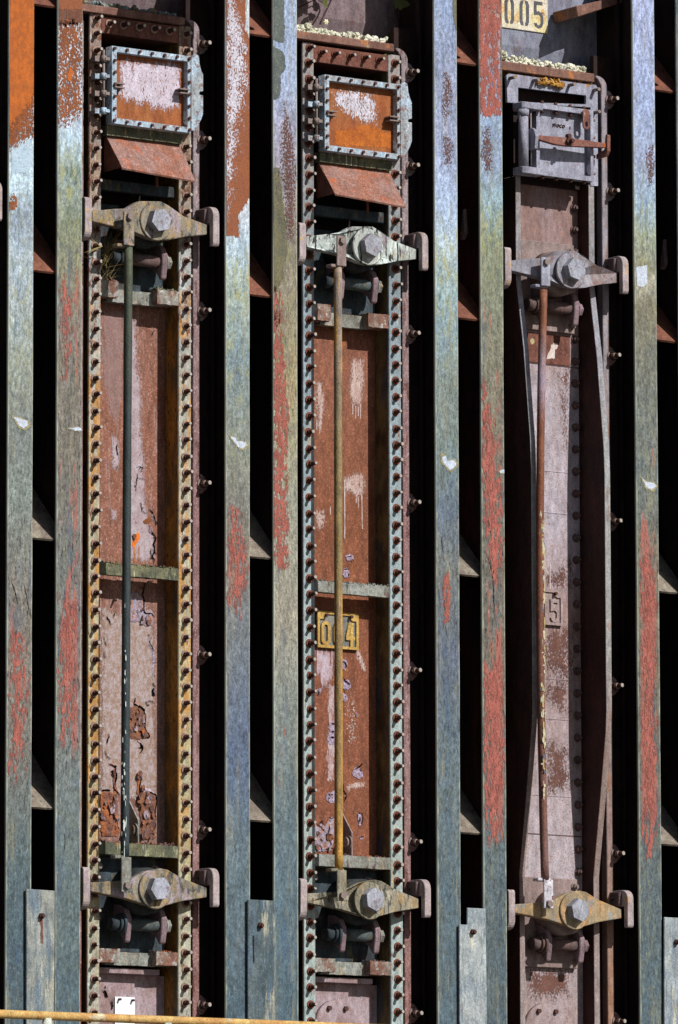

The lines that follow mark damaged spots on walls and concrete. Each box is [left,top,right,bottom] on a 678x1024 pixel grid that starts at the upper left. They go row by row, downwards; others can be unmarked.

corrosion [10,0,34,152]
corrosion [335,124,392,149]
peeling [482,379,505,584]
peeling [227,497,249,620]
spalling [343,659,351,701]
peeling [638,555,659,868]